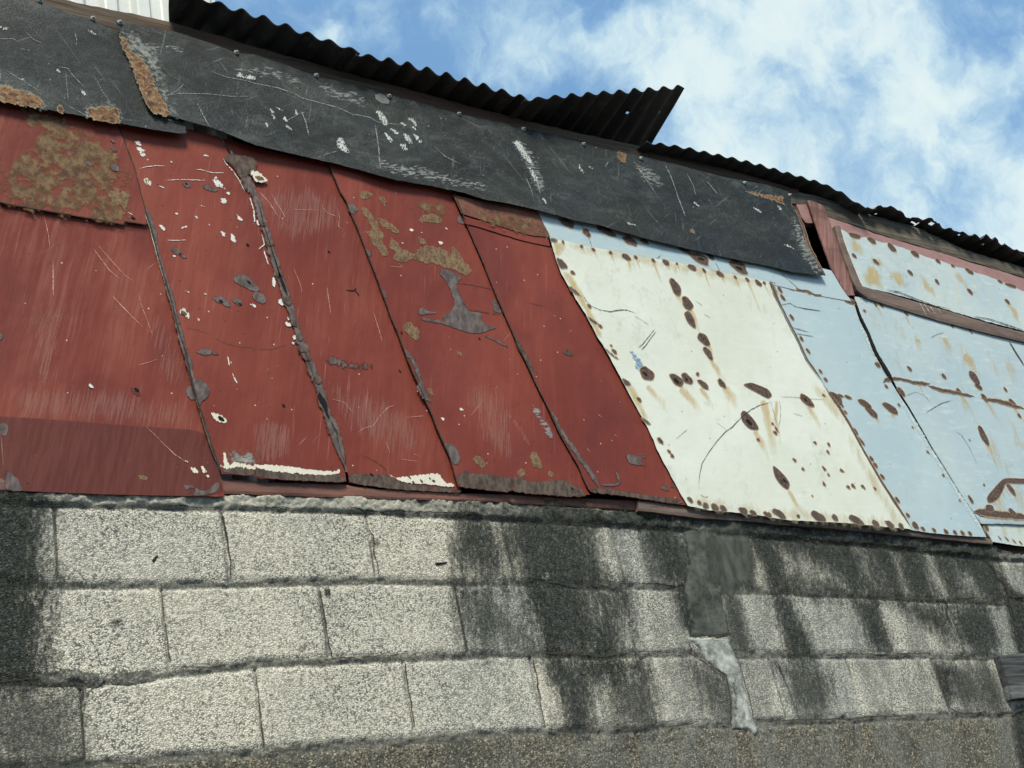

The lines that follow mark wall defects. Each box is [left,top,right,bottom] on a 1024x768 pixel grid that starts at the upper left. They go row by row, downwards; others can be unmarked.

rust [0,85,44,109]
rust [87,106,121,124]
rust [119,34,170,117]
peeling [348,191,508,347]
rust [558,218,649,261]
rust [622,366,655,425]
rust [651,247,972,537]
peeling [184,443,683,504]
damp [447,500,694,739]
damp [726,597,751,652]
damp [744,522,1024,716]
damp [694,665,737,712]